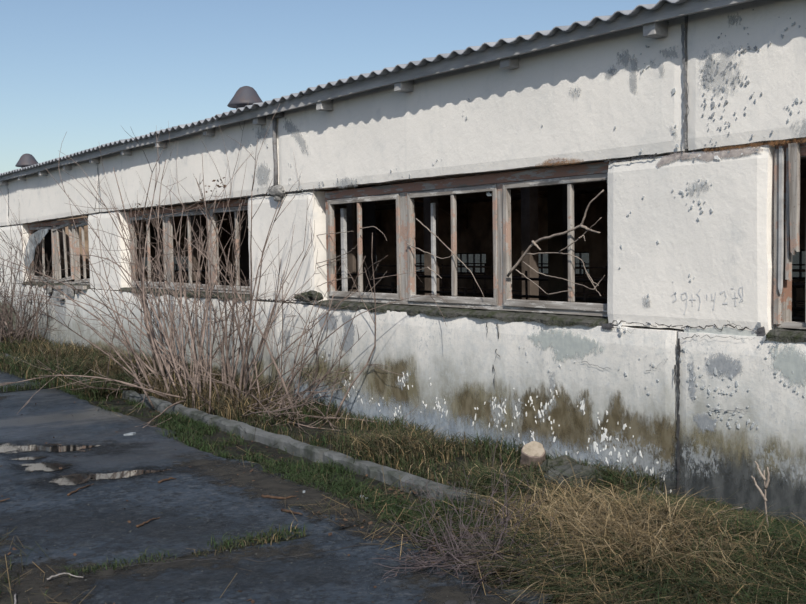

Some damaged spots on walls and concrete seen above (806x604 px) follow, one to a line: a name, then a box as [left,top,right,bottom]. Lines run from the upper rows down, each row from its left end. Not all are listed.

peeling [285,118,308,155]
peeling [606,45,678,92]
spalling [656,45,763,167]
damp [253,356,806,526]
peeling [472,326,603,445]
crack [605,320,760,496]
peeling [680,347,758,433]
peeling [751,322,806,397]